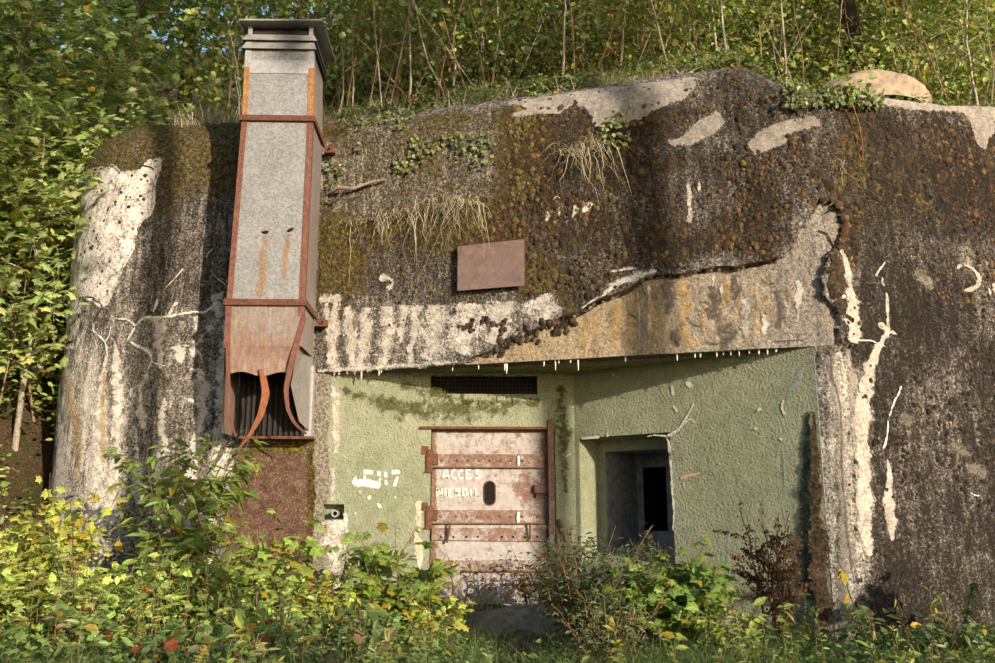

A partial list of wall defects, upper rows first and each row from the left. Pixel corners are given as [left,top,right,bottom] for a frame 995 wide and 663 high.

spalling [64,157,164,350]
crack [817,210,843,250]
crack [63,249,227,369]
damp [318,293,565,372]
crack [471,258,775,359]
damp [581,267,676,344]
damp [705,274,804,350]
damp [329,382,539,454]
damp [554,385,572,493]
crack [647,403,696,530]
damp [851,261,898,556]
damp [950,442,987,481]